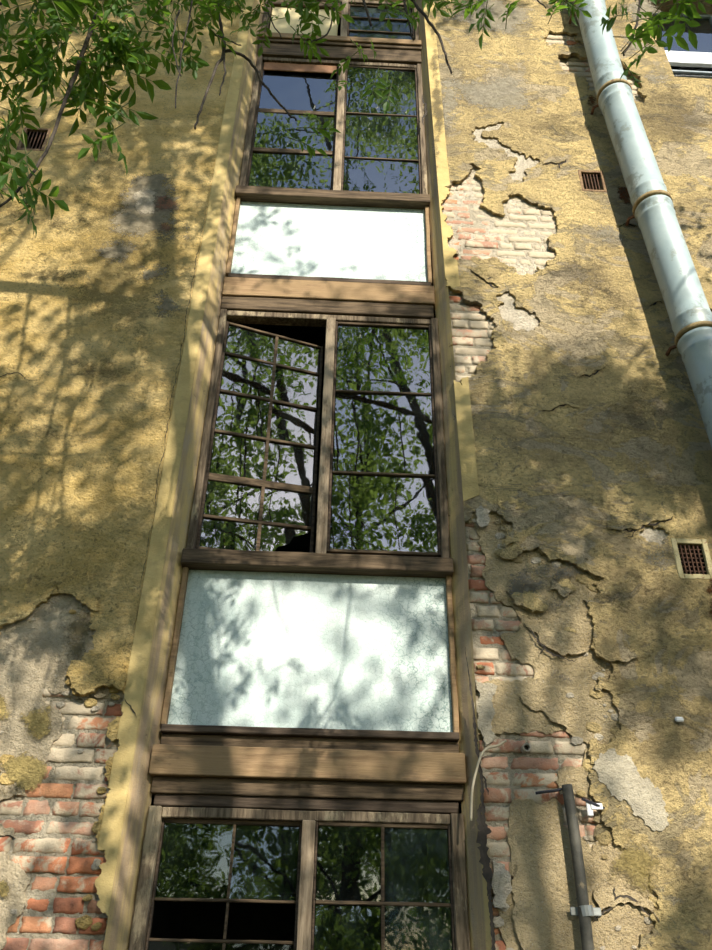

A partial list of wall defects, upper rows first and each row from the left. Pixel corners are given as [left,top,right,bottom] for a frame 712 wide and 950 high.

peeling [96,174,190,263]
spalling [442,166,557,275]
spalling [448,289,540,383]
crack [607,510,673,538]
flaking render [639,526,668,570]
spalling [0,582,127,950]
spalling [465,506,660,950]